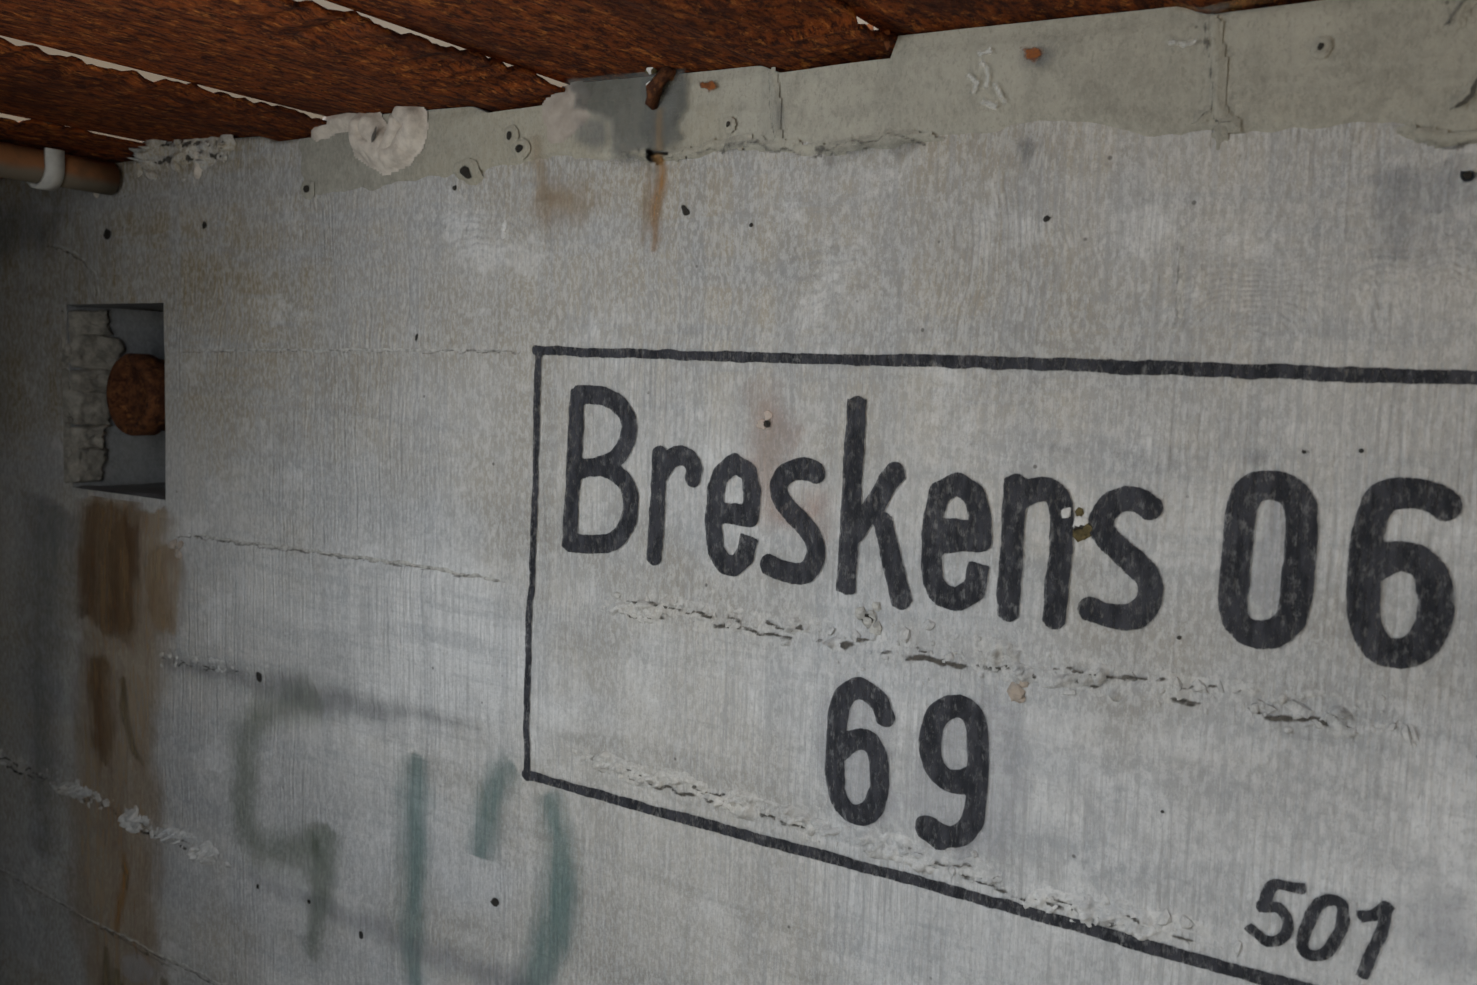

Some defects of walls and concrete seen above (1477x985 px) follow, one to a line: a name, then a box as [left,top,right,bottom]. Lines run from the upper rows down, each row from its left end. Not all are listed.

crack [1446,0,1477,31]
rust [1023,47,1042,61]
rust [699,81,716,92]
leakage [572,72,685,151]
crack [1397,78,1477,149]
peeling [221,134,236,150]